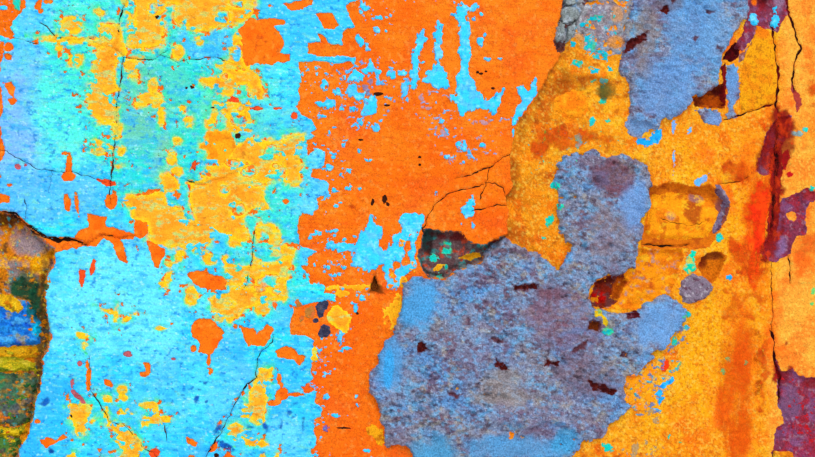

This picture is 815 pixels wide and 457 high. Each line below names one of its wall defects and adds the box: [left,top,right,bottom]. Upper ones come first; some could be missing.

crack [2,199,126,246]
crack [7,50,224,204]
crack [87,357,157,457]
crack [206,339,273,456]
peeling [0,0,514,457]
crack [421,154,510,232]
peeling [363,137,730,457]
peeling [553,0,788,139]
corrosion [729,107,795,303]
crack [770,258,791,402]